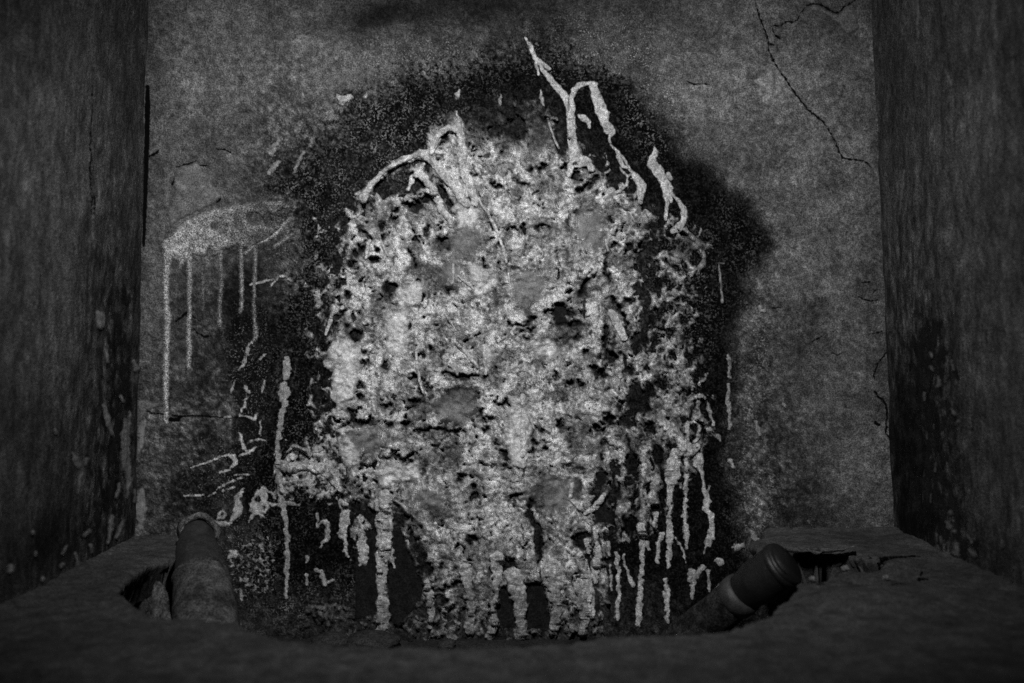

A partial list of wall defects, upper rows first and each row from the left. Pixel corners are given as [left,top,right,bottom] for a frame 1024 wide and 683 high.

water stain [161,19,777,642]
crack [755,0,871,167]